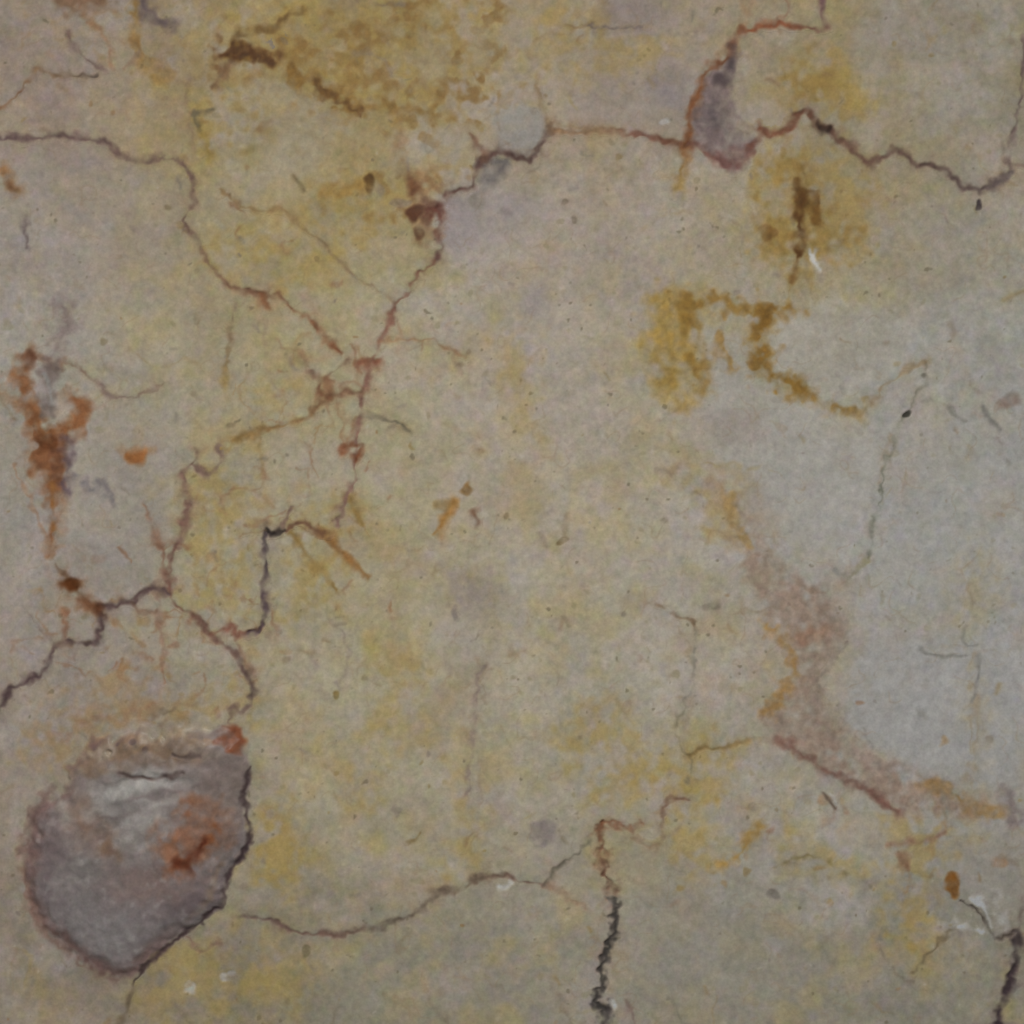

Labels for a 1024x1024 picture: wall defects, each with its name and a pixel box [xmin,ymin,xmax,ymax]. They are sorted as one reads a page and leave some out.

water stain [675,0,834,177]
crack [754,17,1024,198]
corrosion [0,289,108,562]
corrosion [113,423,160,469]
crack [0,17,697,722]
water stain [625,272,877,430]
crack [829,357,931,588]
crack [183,599,763,1024]
crack [770,852,875,891]
corrosion [941,870,962,901]
crack [908,889,1024,1024]